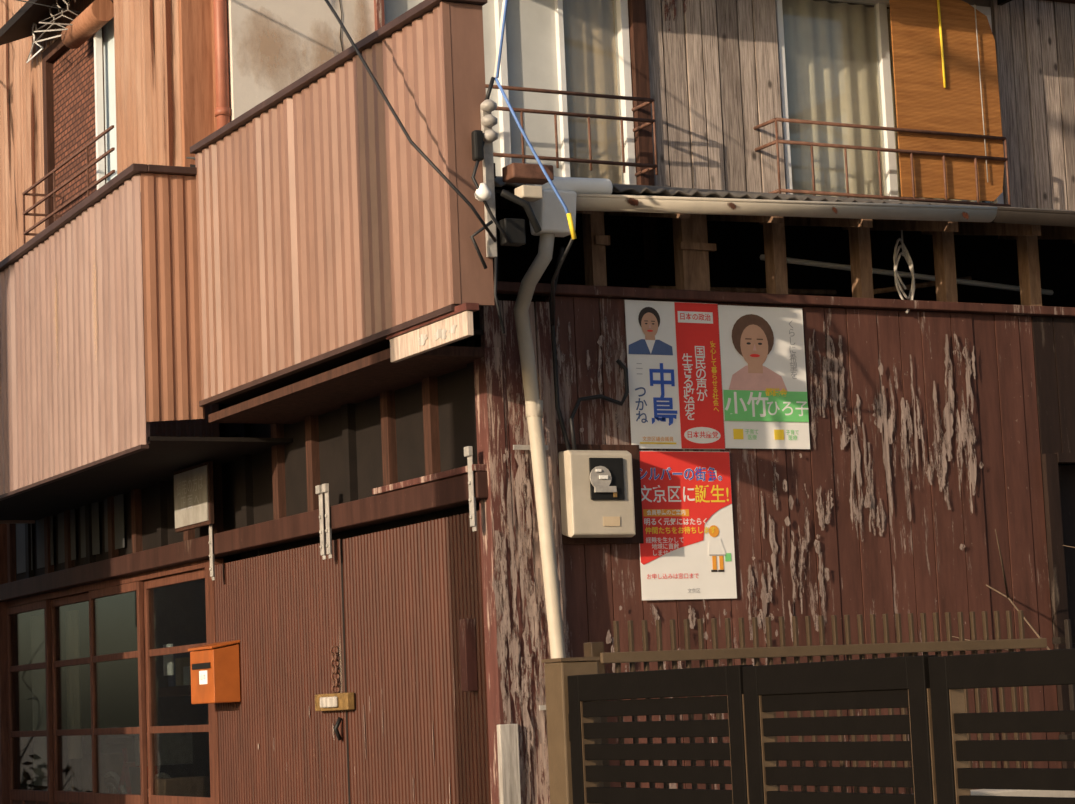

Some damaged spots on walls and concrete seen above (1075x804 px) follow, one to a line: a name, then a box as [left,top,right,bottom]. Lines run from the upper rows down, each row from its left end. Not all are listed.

peeling [587,317,626,405]
peeling [808,322,984,541]
peeling [747,449,834,644]
peeling [492,393,550,804]
peeling [558,580,570,658]
peeling [606,630,630,673]
peeling [688,599,709,639]